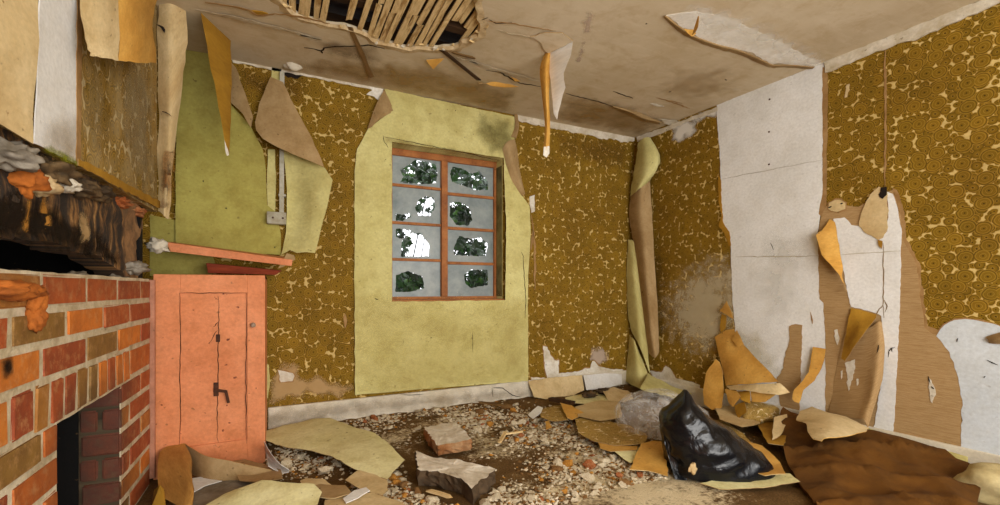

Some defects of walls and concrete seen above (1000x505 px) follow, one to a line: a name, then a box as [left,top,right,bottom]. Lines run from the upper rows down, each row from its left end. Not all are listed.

crack [304,44,384,54]
peeling [664,11,822,69]
spalling [33,0,553,219]
spalling [143,237,170,254]
damp [665,262,734,353]
peeling [816,192,902,431]
flaking render [530,345,623,380]
peeling [928,376,936,403]
flaking render [936,317,1000,455]